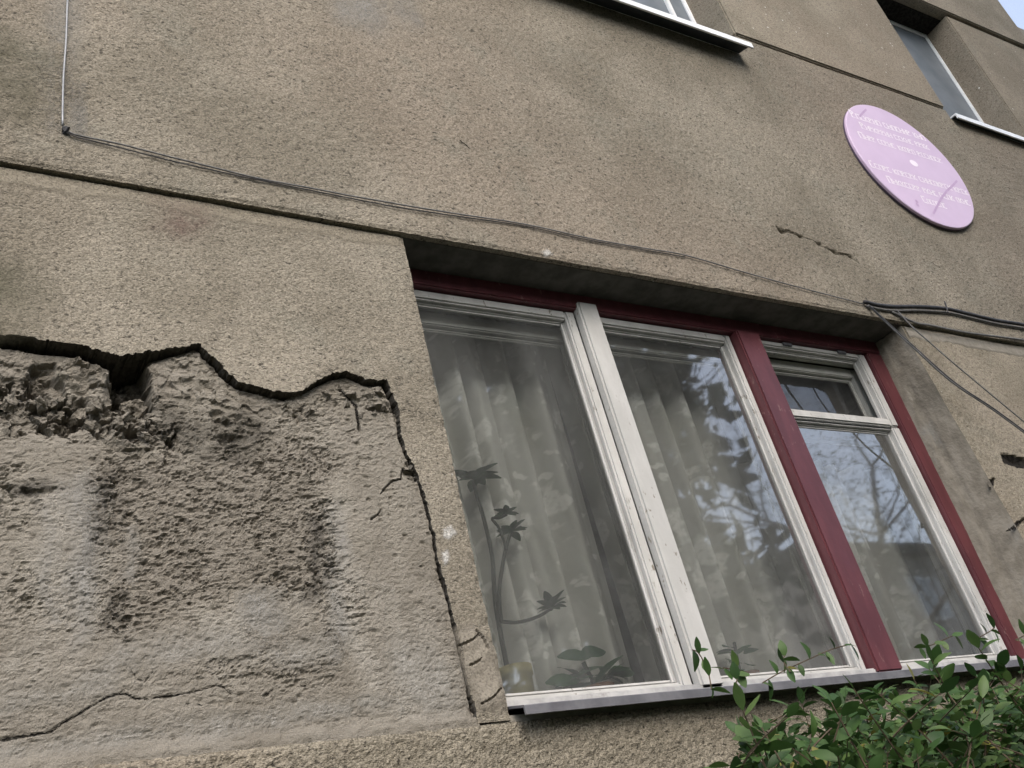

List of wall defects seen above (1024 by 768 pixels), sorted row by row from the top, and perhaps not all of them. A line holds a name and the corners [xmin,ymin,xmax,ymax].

crack [340,391,360,430]
spalling [1001,455,1024,468]
spalling [0,348,505,768]
crack [372,469,495,717]
crack [0,667,232,741]